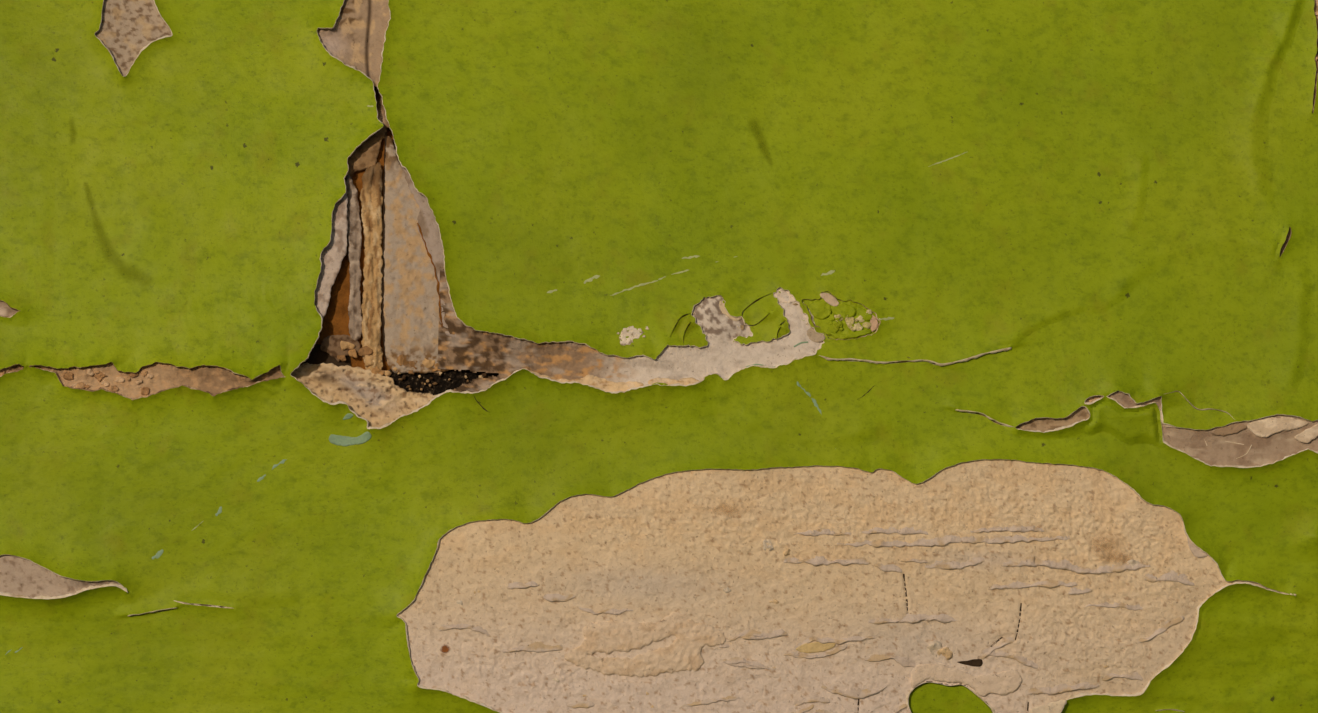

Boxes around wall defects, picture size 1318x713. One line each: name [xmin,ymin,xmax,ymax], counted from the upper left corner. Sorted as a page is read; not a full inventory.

peeling [94,0,172,77]
peeling [317,0,391,87]
peeling [0,300,20,318]
flaking render [291,126,1013,446]
peeling [1101,391,1318,468]
peeling [0,554,128,599]
peeling [397,459,1296,713]